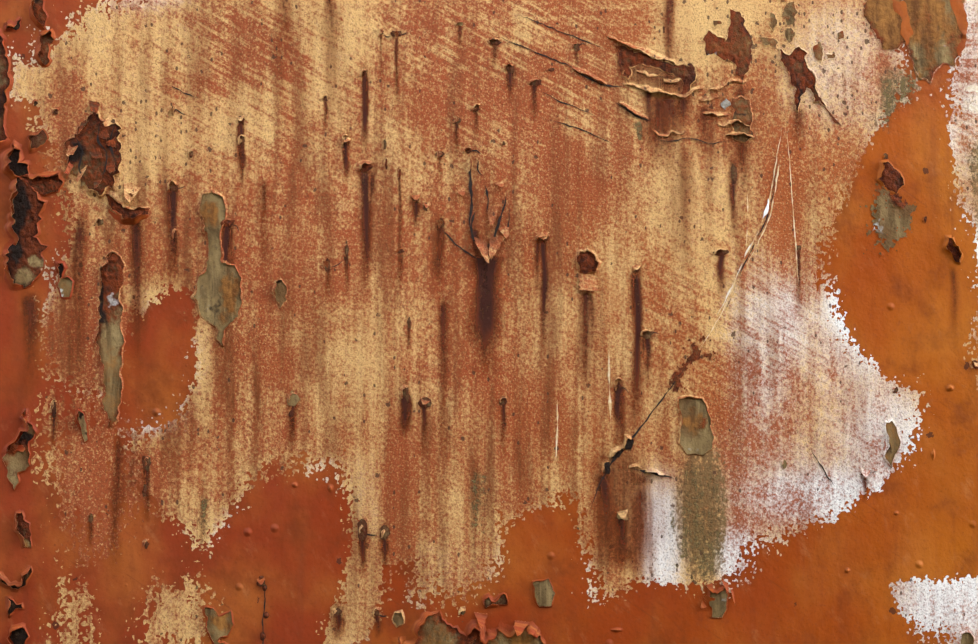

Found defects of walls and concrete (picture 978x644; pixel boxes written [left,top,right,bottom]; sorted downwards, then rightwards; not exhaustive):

corrosion [665,0,674,61]
peeling [0,140,50,291]
corrosion [341,68,431,273]
corrosion [713,248,729,288]
peeling [945,0,978,259]
corrosion [400,300,448,435]
corrosion [614,264,658,437]
crack [589,336,716,514]
peeling [39,574,101,644]
peeling [126,560,235,644]
peeling [391,607,546,644]
peeling [889,573,978,644]